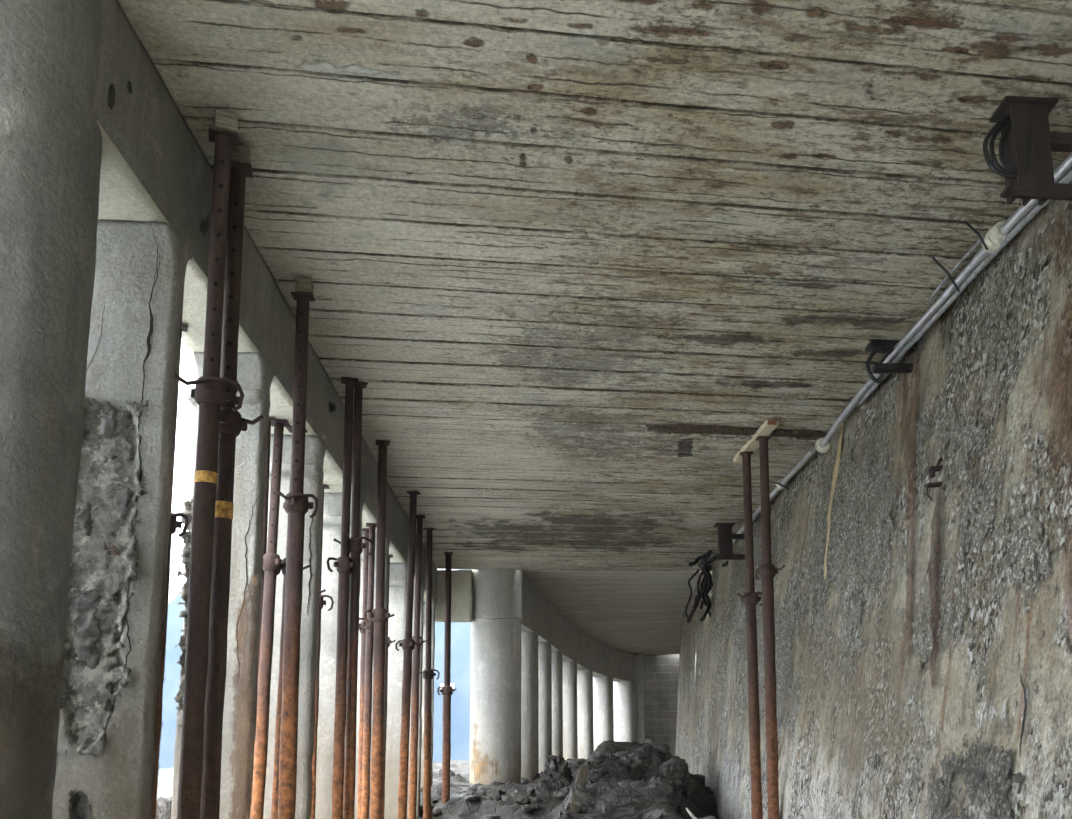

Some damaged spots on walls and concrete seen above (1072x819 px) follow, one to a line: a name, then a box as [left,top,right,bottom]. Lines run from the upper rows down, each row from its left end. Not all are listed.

crack [133,221,160,536]
spalling [57,398,148,755]
crack [113,579,131,713]
rust [897,342,918,659]
rust [928,485,941,687]
spalling [69,791,91,819]
leakage [705,750,750,819]
leakage [918,699,1019,819]